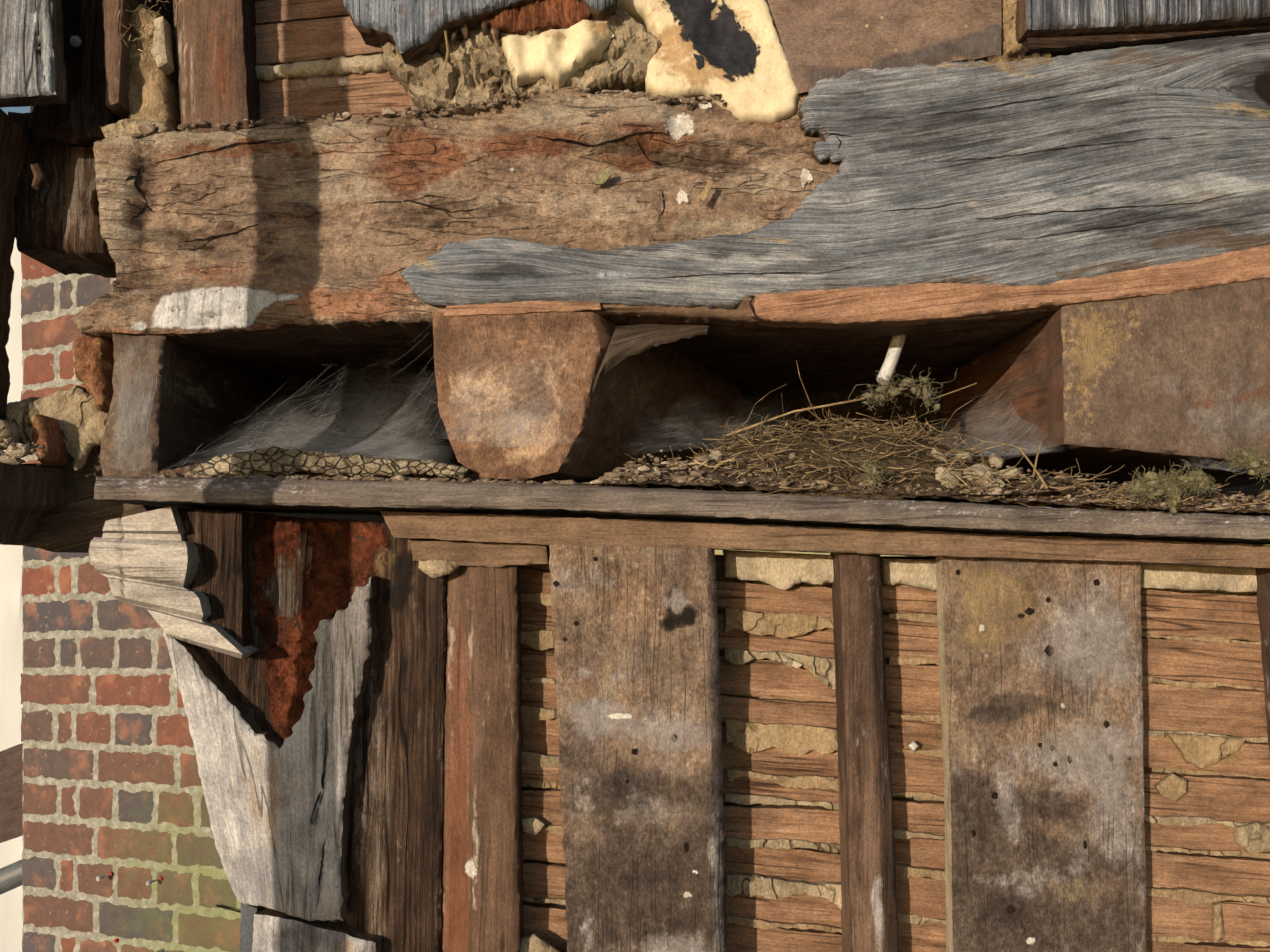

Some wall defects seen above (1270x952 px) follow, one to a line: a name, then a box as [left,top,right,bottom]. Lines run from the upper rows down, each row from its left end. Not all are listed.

crack [124,138,293,220]
damp [963,569,1032,648]
flaking render [779,654,803,668]